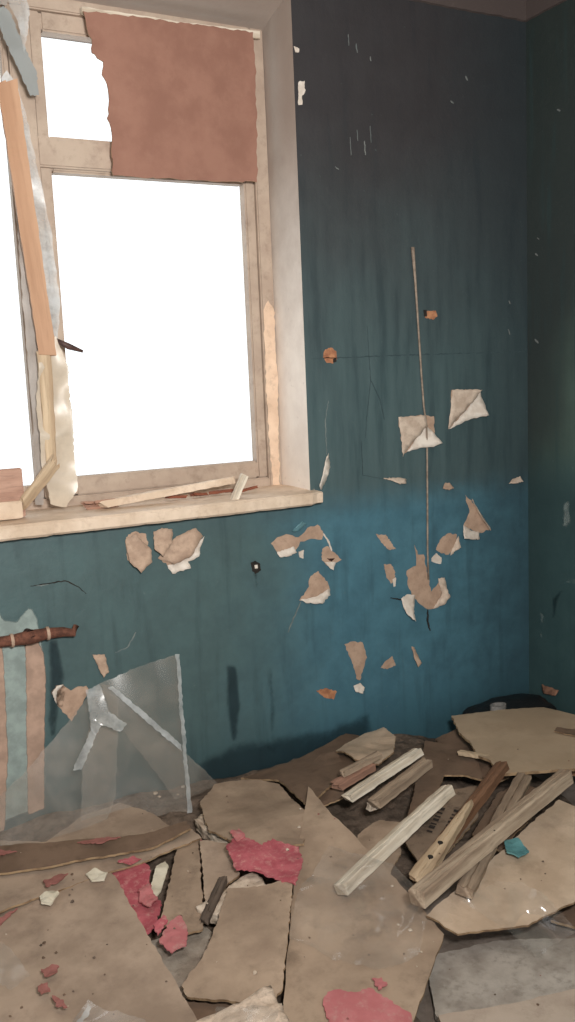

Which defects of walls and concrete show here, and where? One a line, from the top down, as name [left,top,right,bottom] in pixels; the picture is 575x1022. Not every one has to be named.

peeling [448,389,489,429]
peeling [398,415,442,455]
peeling [125,528,204,574]
peeling [271,521,342,632]
peeling [376,534,396,550]
peeling [384,495,491,631]
peeling [345,641,367,694]
peeling [381,656,395,669]